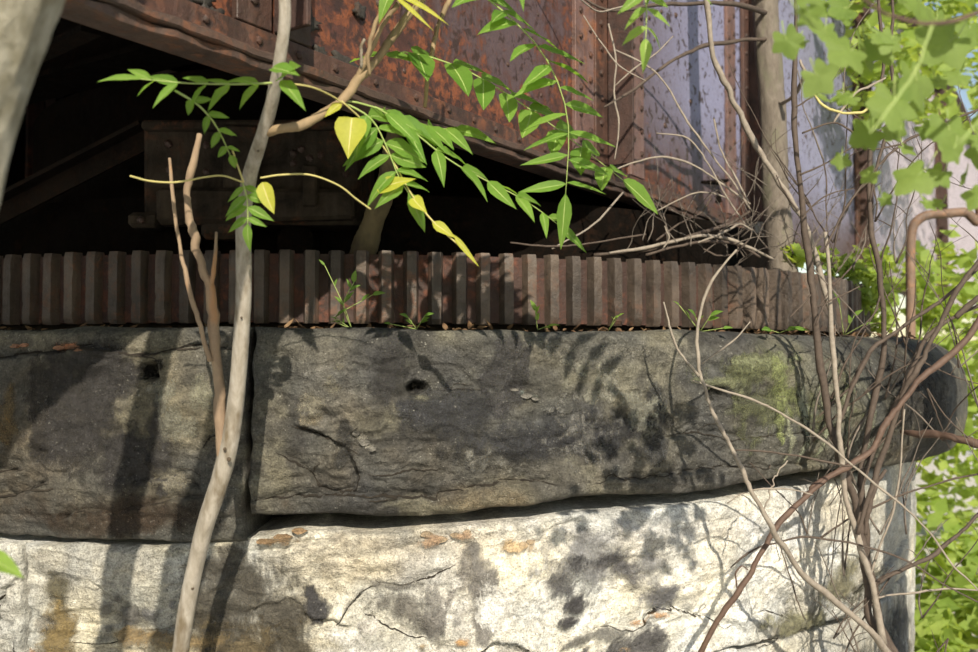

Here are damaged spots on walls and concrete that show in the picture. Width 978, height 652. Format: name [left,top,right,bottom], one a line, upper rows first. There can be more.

crack [0,468,53,497]
water stain [0,338,197,538]
water stain [334,419,352,469]
crack [251,425,555,502]
water stain [370,334,674,468]
crack [596,465,778,483]
crack [663,422,810,442]
water stain [731,350,829,463]
water stain [192,545,379,652]
crack [335,566,452,639]
water stain [370,530,684,652]
crack [595,606,810,648]